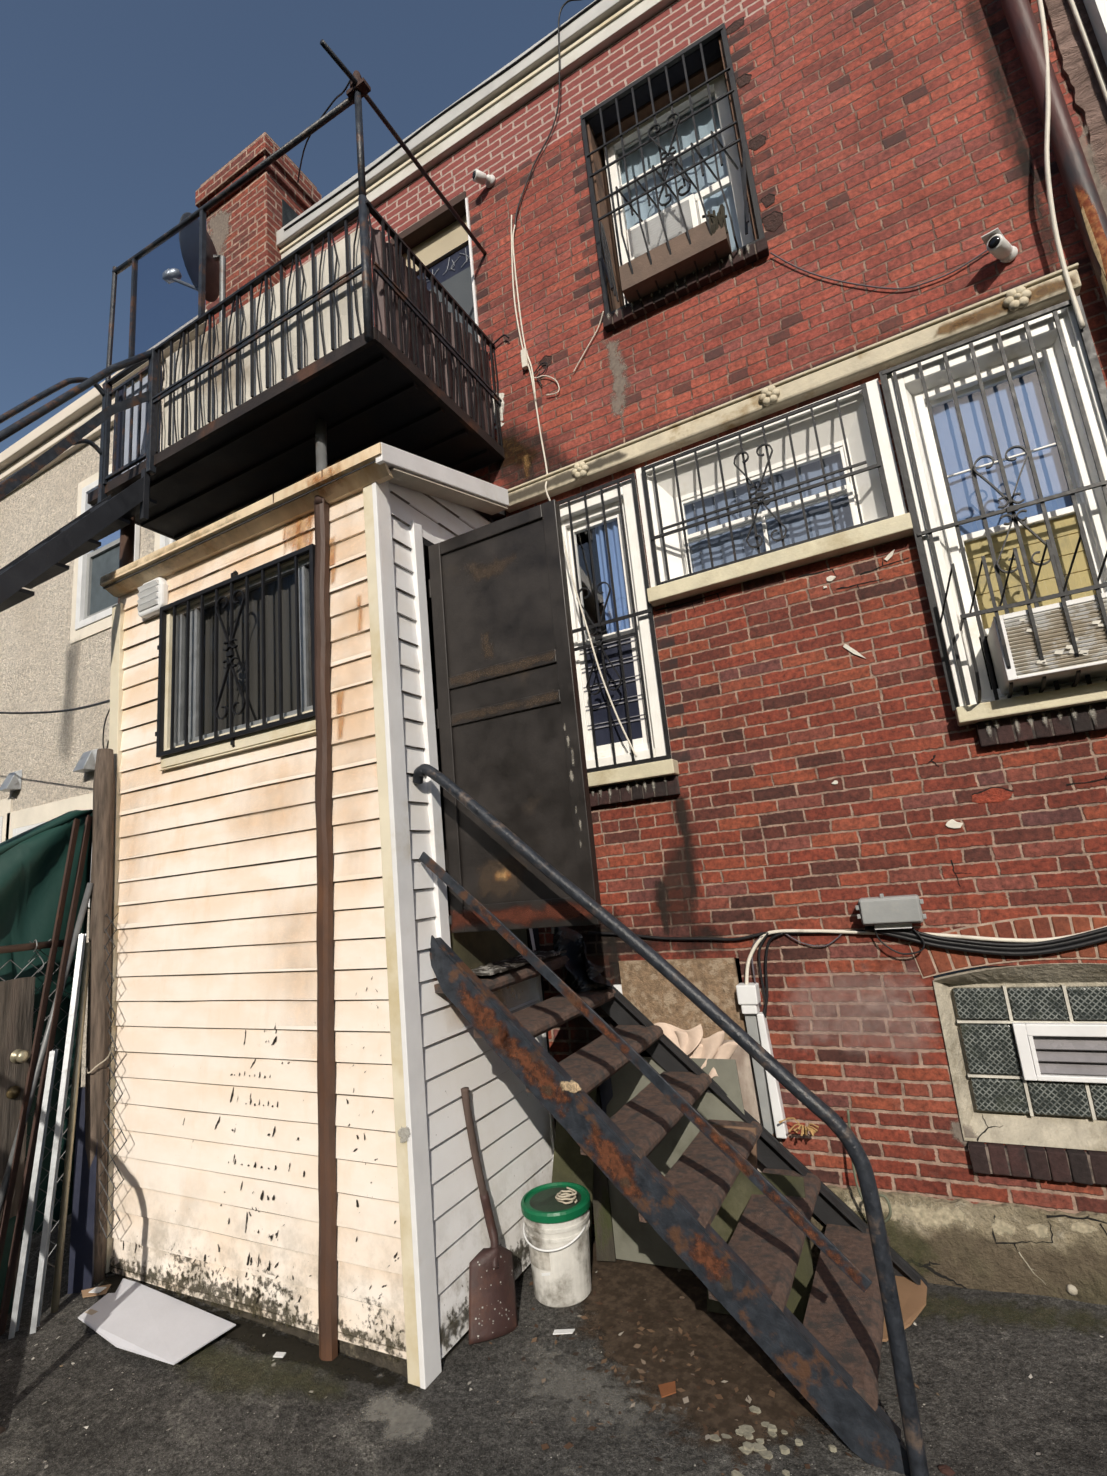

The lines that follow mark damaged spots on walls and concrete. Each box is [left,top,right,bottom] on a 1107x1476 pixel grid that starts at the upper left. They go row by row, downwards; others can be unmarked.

corrosion [289,518,311,549]
damp [657,799,696,934]
corrosion [460,987,581,1117]
corrosion [564,990,630,1054]
corrosion [585,1125,641,1196]
corrosion [681,1104,859,1290]
damp [109,1243,319,1334]
crack [907,1260,967,1289]
crack [992,1215,1107,1281]
damp [337,1298,405,1362]